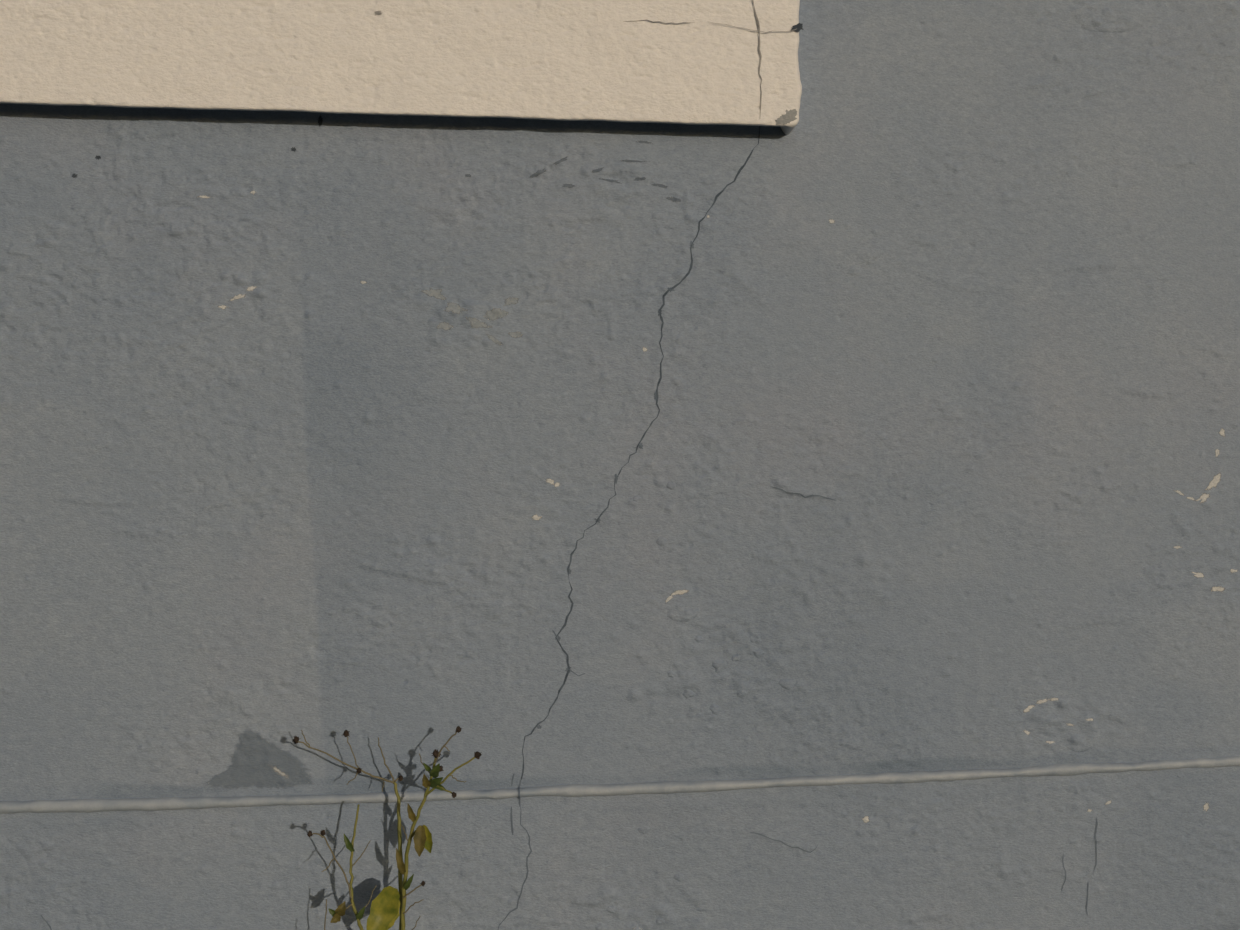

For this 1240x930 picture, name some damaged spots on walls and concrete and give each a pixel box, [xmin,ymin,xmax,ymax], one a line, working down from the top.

crack [498,0,796,929]